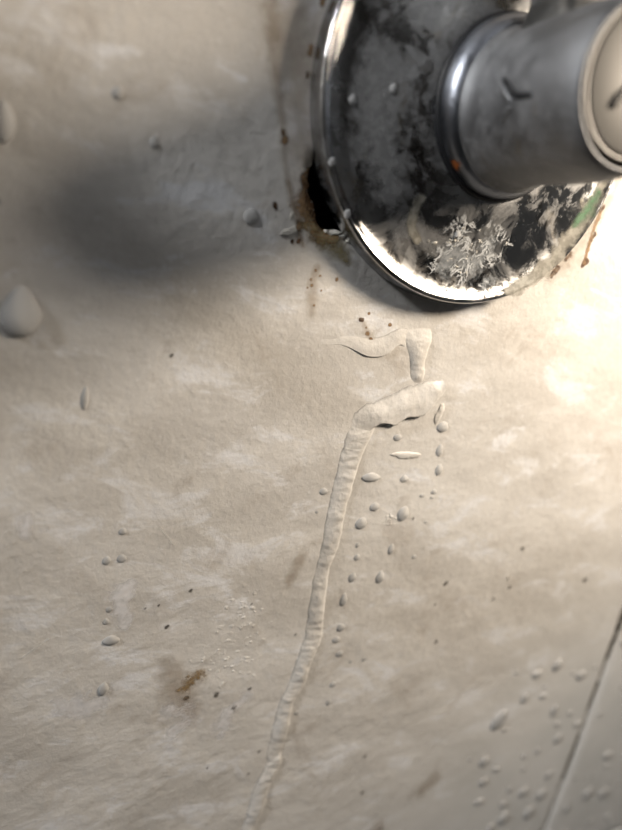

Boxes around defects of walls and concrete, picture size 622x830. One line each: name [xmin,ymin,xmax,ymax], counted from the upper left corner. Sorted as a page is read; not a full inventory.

corrosion [290,168,349,263]
spalling [300,159,349,243]